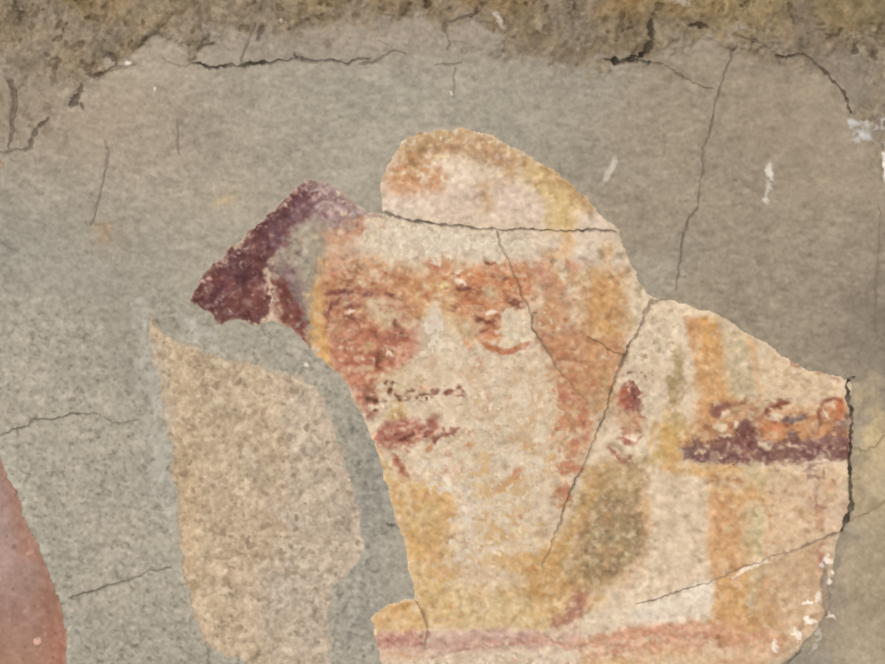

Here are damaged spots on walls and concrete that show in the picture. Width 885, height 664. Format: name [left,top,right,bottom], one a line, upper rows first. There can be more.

spalling [413,0,458,17]
crack [0,78,50,154]
water stain [760,161,775,206]
water stain [766,0,885,439]
crack [381,6,853,567]
crack [0,411,139,436]
crack [635,375,885,605]